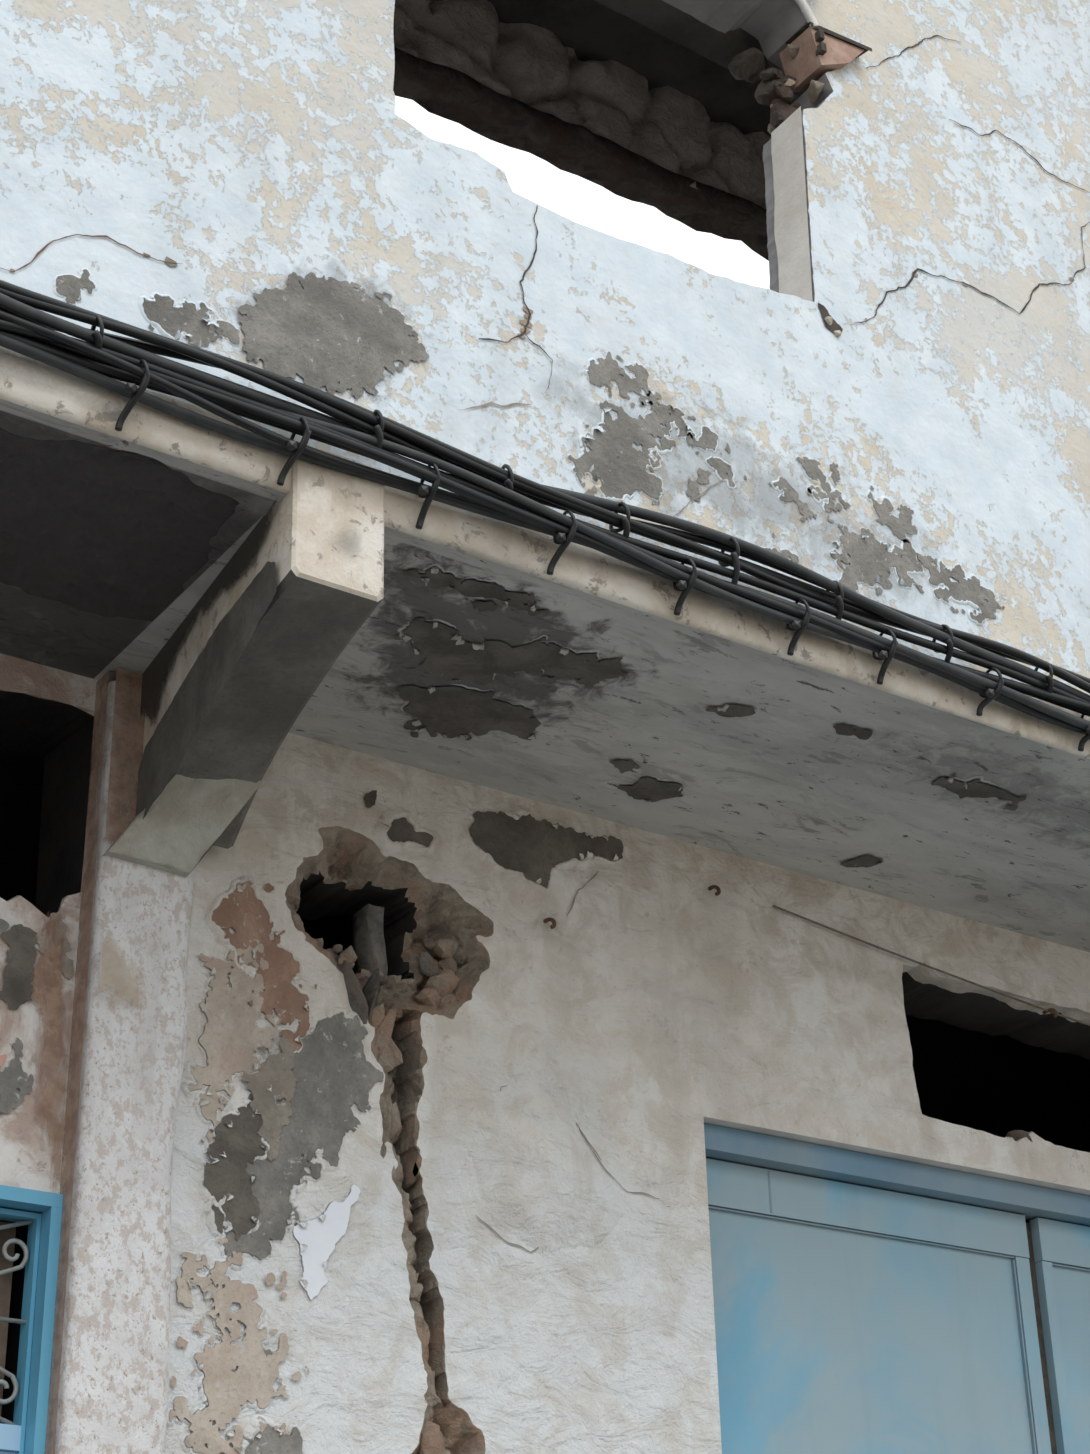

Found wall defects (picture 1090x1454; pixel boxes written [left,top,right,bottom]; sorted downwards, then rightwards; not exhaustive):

crack [866,35,961,69]
crack [1,234,183,273]
crack [458,205,553,410]
crack [850,119,1090,325]
peeling [566,351,747,505]
peeling [402,563,550,616]
peeling [769,455,1005,627]
peeling [393,615,628,741]
flaking render [465,806,627,896]
peeling [0,913,74,1010]
peeling [0,1037,34,1114]
spalling [167,790,494,1454]